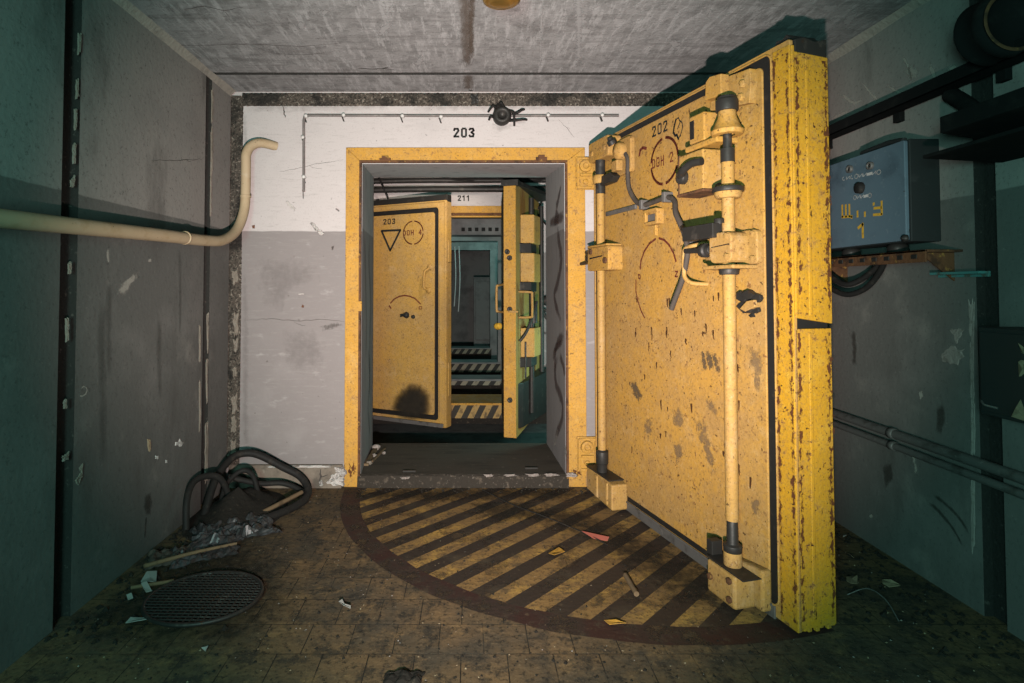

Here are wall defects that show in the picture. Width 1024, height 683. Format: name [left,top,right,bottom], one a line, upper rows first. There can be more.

damp [461,0,474,63]
rust [822,61,832,310]
spalling [230,391,238,454]
spalling [289,465,347,486]
rust [772,53,805,623]
rust [825,332,838,617]